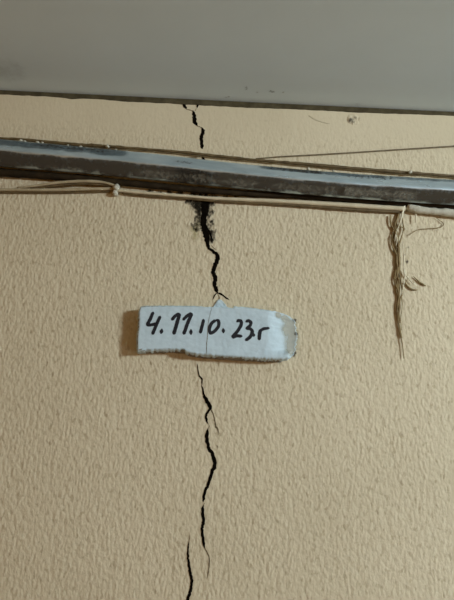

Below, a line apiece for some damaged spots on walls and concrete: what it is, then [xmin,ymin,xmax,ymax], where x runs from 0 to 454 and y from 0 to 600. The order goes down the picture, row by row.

crack [186,195,229,600]